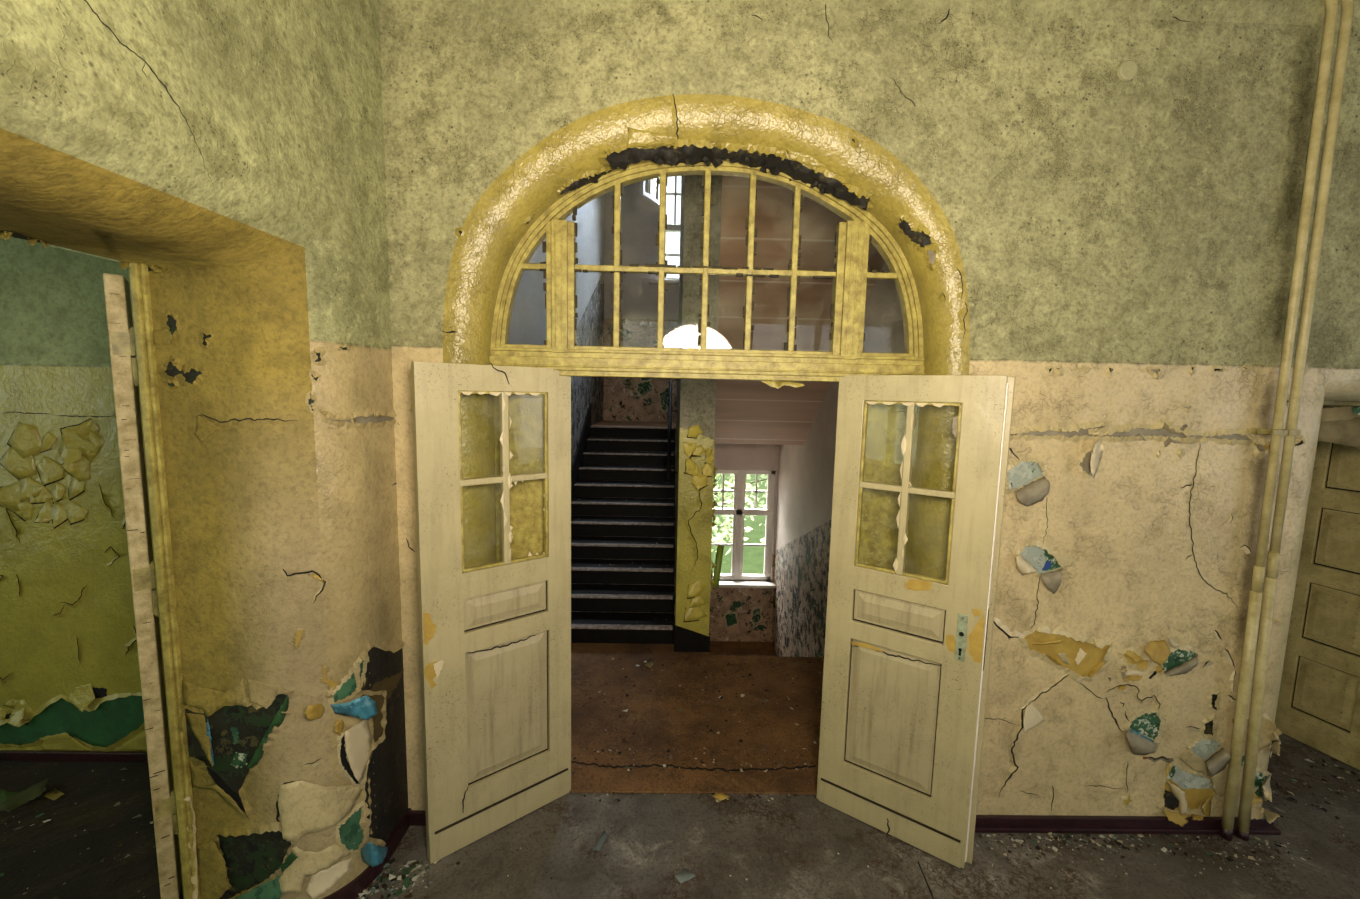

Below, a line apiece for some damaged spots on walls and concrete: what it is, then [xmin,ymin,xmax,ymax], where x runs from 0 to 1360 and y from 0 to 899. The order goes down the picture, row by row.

crack [84,0,214,187]
spalling [556,127,875,212]
spalling [892,214,940,271]
peeling [1005,404,1271,506]
crack [994,577,1040,638]
peeling [1018,625,1200,690]
crack [1182,444,1239,704]
peeling [0,683,147,752]
peeling [178,653,388,899]
crack [1019,786,1054,812]
crack [1026,673,1202,793]
spalling [1124,690,1283,827]